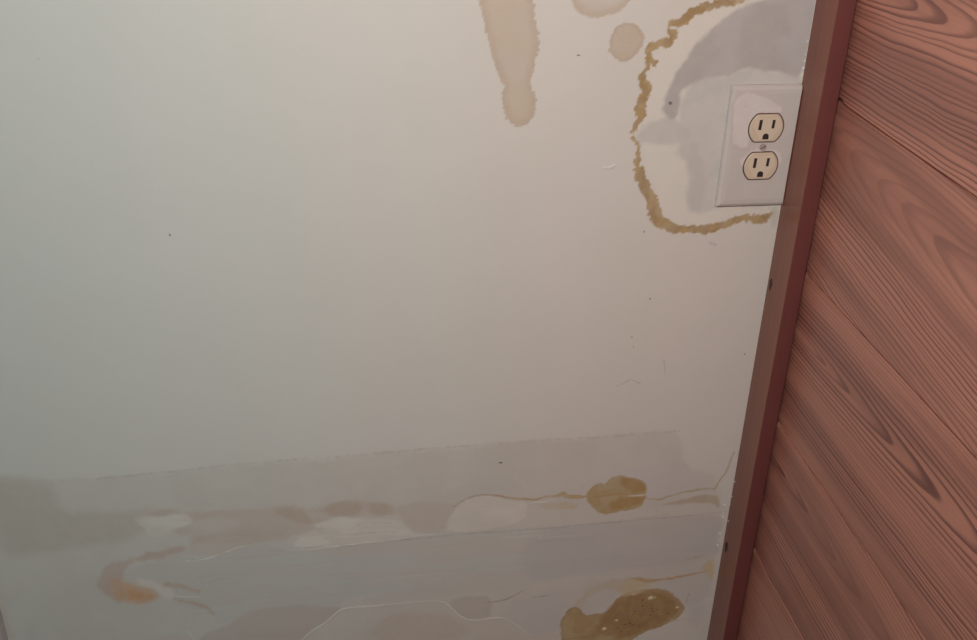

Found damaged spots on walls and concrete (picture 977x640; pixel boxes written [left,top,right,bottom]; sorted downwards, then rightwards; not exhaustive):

leakage [477,0,541,129]
leakage [570,0,780,237]
peeling [0,427,733,640]
leakage [585,474,649,515]
leakage [558,575,697,640]